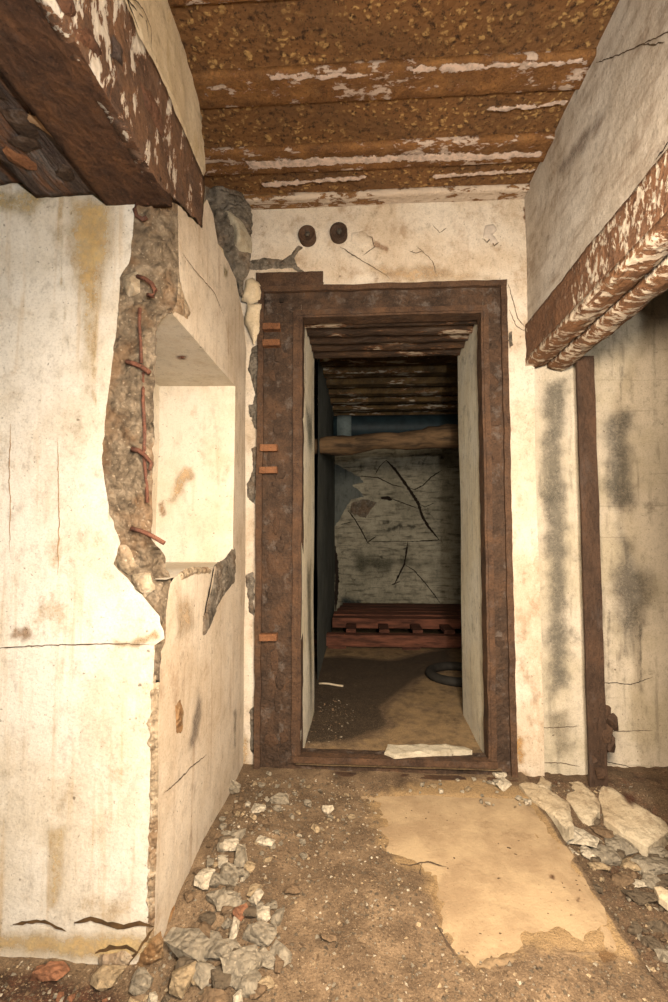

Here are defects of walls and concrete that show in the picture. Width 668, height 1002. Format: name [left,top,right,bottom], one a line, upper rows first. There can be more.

peeling [268,71,373,81]
peeling [407,58,587,74]
crack [596,32,668,63]
peeling [488,100,568,112]
peeling [125,0,304,299]
peeling [245,151,543,187]
spalling [248,345,258,429]
spalling [247,447,257,504]
crack [317,460,442,617]
leakage [544,383,567,692]
spalling [98,202,255,967]
crack [13,916,154,966]